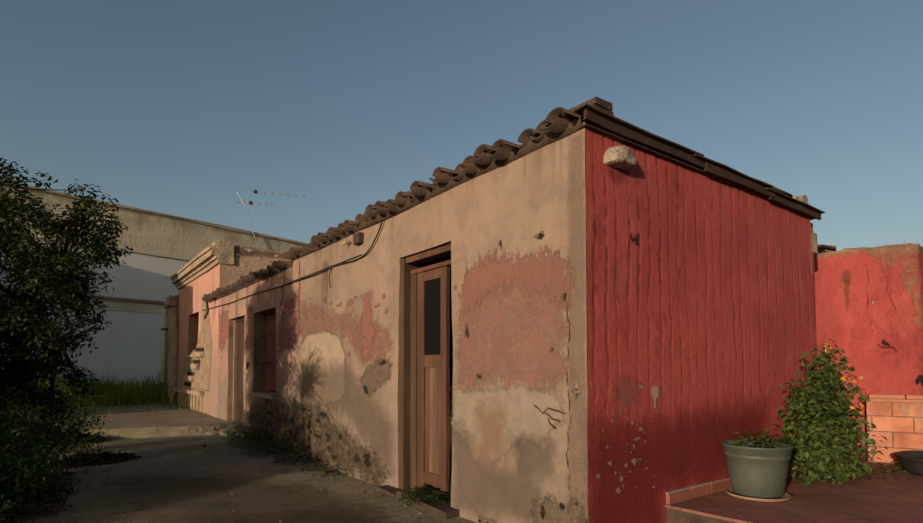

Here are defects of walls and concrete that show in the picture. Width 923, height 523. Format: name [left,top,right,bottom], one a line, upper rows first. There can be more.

peeling [274,287,393,398]
crack [534,302,571,489]
peeling [608,409,655,495]